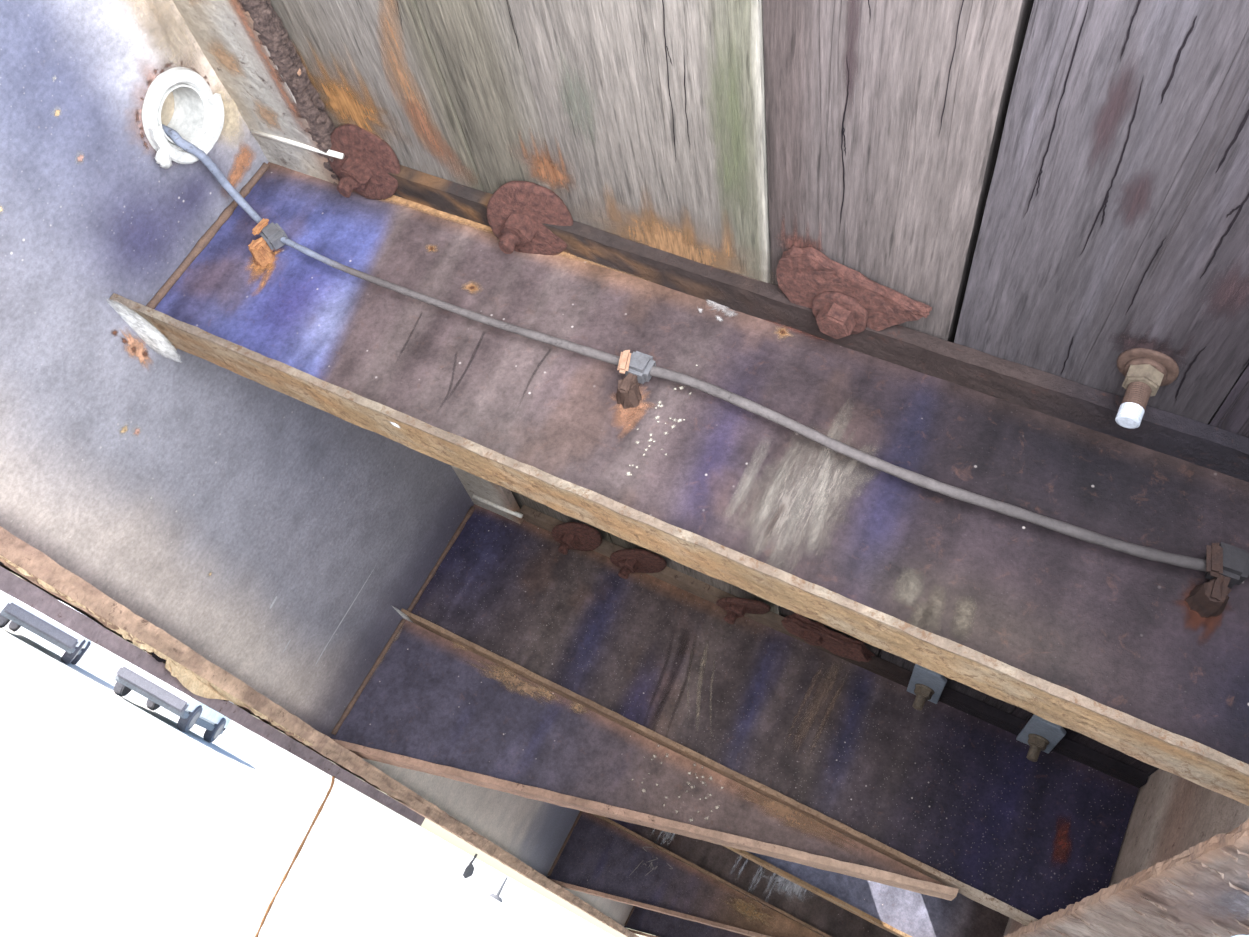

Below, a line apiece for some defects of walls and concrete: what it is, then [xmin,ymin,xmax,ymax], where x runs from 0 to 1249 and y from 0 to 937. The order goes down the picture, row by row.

rust [134,0,209,148]
rust [221,93,239,136]
rust [229,0,379,187]
crack [840,57,849,223]
crack [938,0,964,139]
crack [1024,2,1089,215]
crack [1080,0,1197,255]
crack [1216,109,1249,172]
rust [250,251,279,287]
crack [1200,193,1249,279]
rust [617,391,648,431]
rust [1122,337,1187,361]